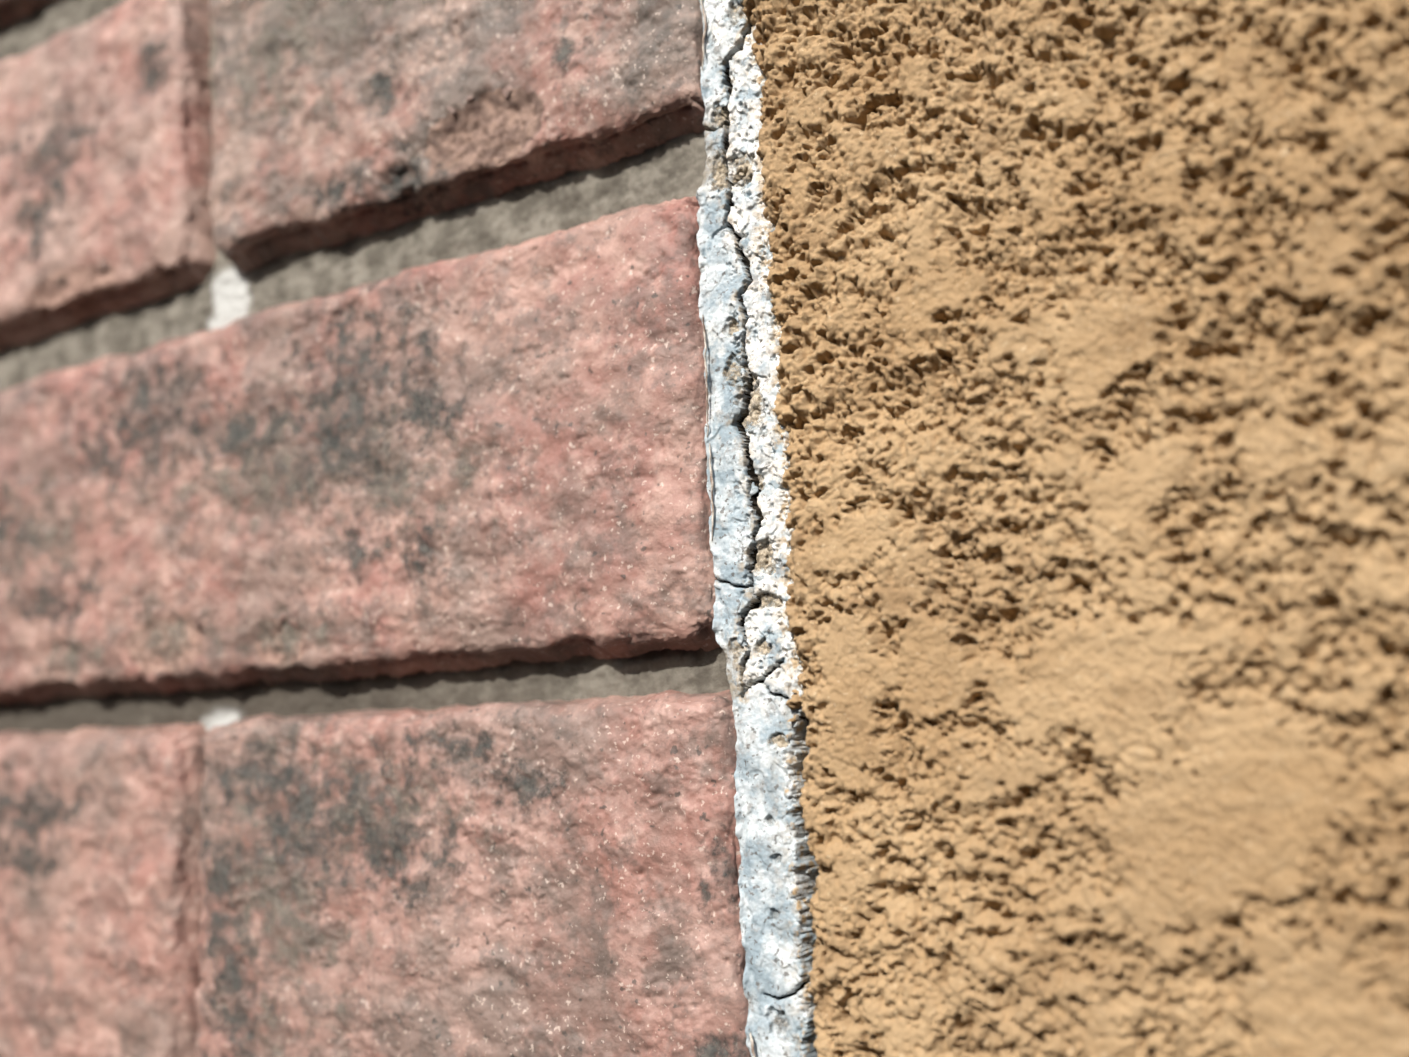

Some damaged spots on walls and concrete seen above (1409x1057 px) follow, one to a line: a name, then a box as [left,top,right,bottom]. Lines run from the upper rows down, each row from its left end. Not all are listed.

crack [708,24,810,726]
crack [770,978,810,1000]